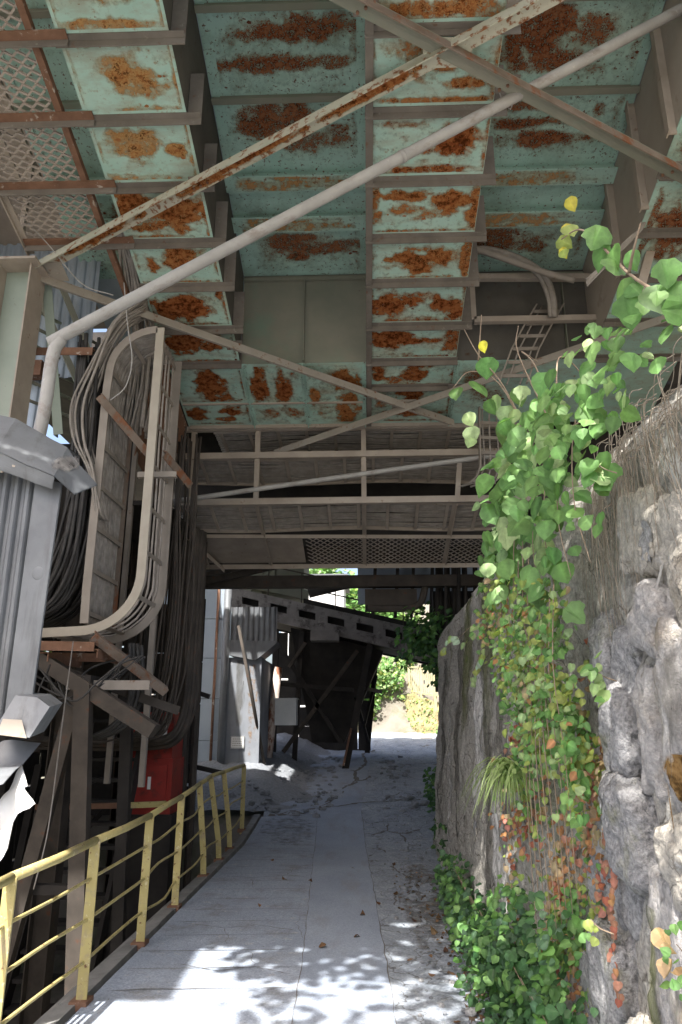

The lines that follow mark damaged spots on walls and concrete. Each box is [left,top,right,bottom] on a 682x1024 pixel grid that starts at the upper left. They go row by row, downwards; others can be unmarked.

rust [217,10,357,91]
rust [484,2,623,80]
rust [64,41,590,424]
rust [638,188,682,262]
crack [183,750,423,1024]